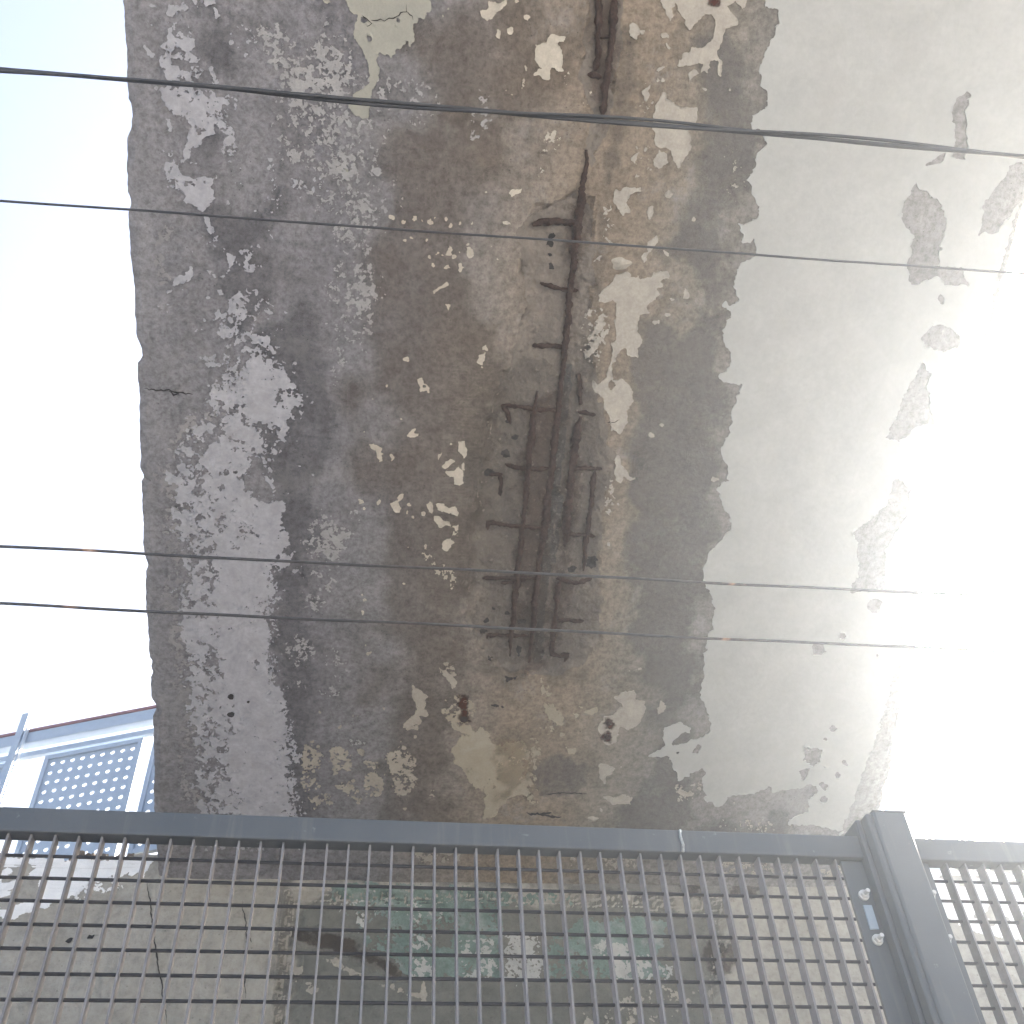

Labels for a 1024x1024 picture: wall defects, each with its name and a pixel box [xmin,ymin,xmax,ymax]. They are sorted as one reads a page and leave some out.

damp [256,17,440,386]
damp [470,89,492,141]
damp [675,41,754,293]
crack [144,388,193,396]
spalling [143,0,747,819]
peeling [648,0,1024,836]
damp [281,634,350,696]
damp [300,509,360,612]
rust [457,695,471,724]
damp [618,324,723,830]